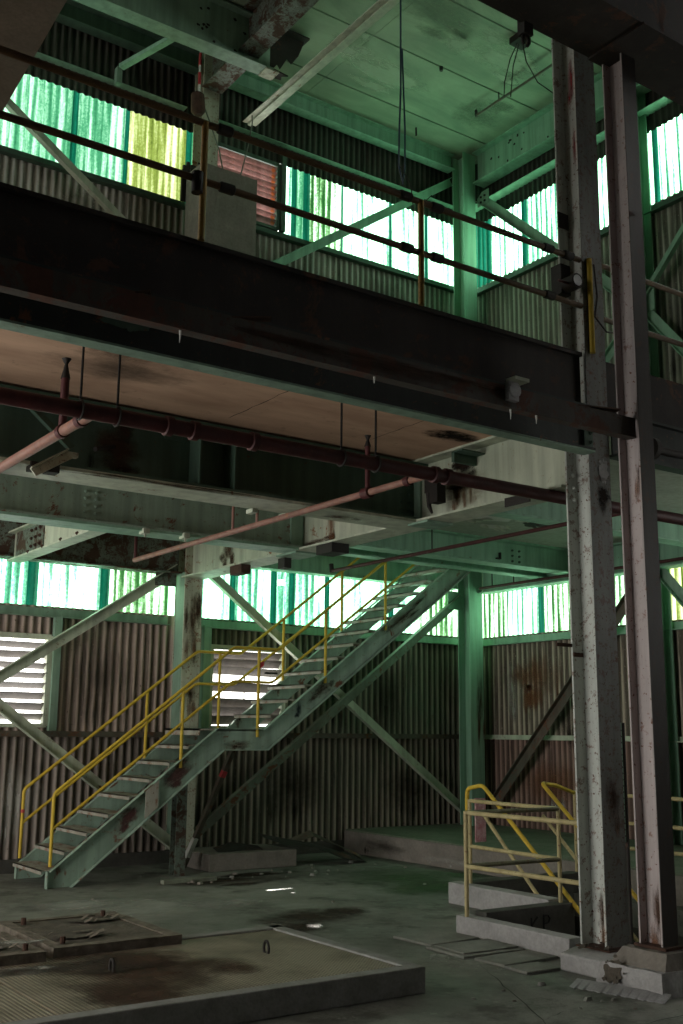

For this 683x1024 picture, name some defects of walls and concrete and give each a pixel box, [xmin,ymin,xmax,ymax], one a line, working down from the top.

rust [220,547,233,566]
rust [185,596,201,654]
damp [261,908,364,932]
damp [0,951,255,1006]